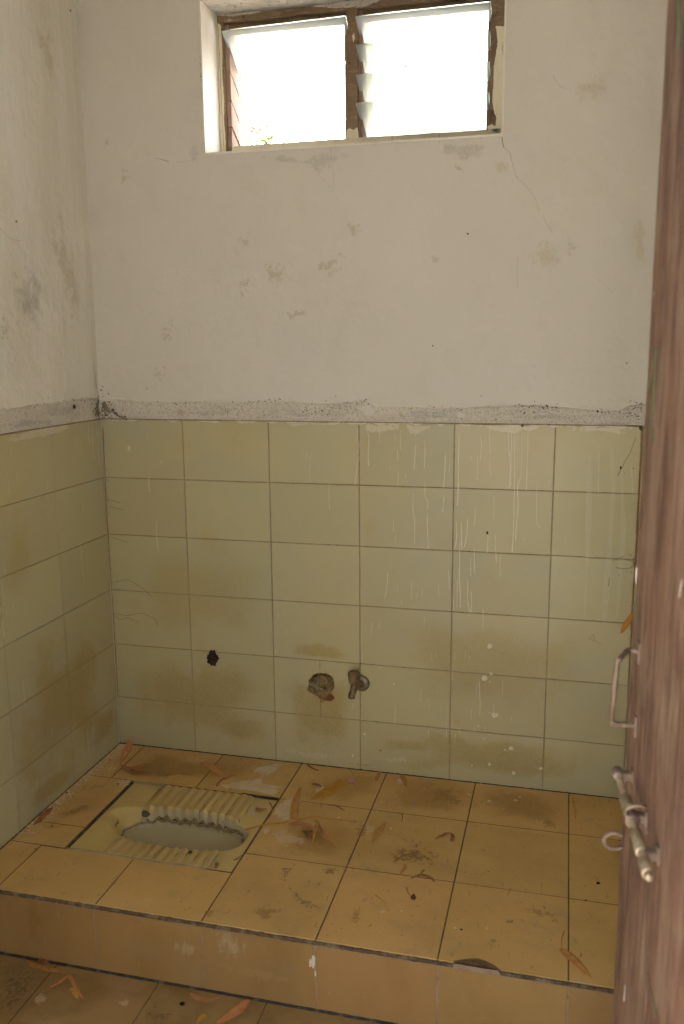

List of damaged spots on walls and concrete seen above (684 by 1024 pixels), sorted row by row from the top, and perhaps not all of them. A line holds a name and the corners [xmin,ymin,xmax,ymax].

spalling [454,958,500,974]